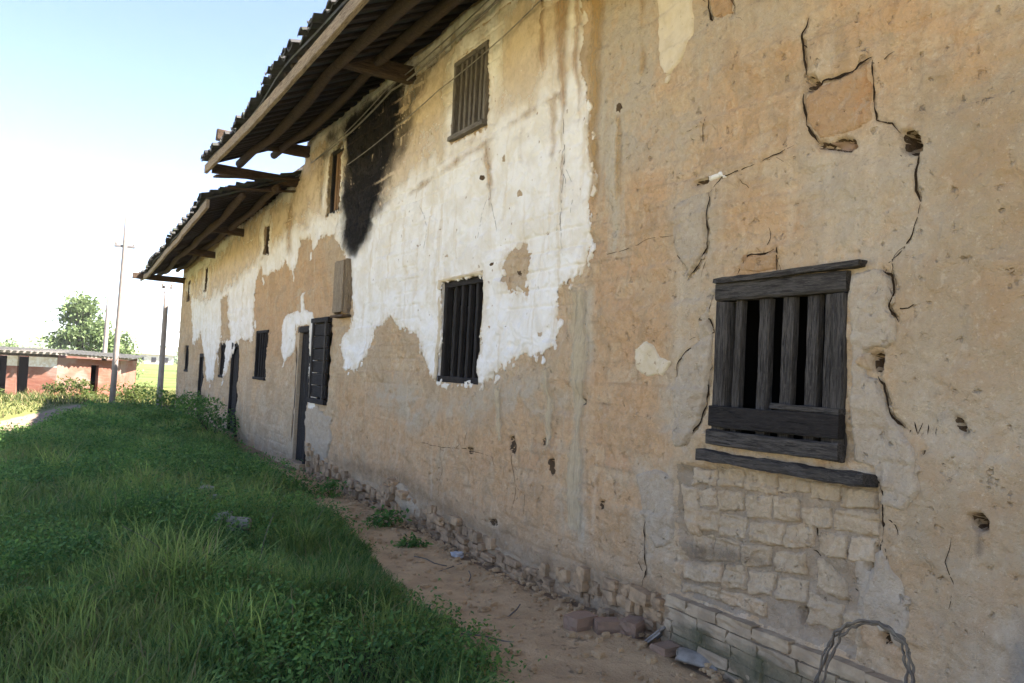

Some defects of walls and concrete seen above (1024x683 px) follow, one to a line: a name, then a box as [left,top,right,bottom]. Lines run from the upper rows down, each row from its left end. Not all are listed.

leakage [503,0,567,98]
leakage [184,35,456,300]
flaking render [184,0,598,408]
crack [609,18,921,364]
spalling [805,65,873,153]
hole [904,130,924,156]
crack [684,368,712,446]
crack [878,377,905,428]
crack [637,524,647,582]